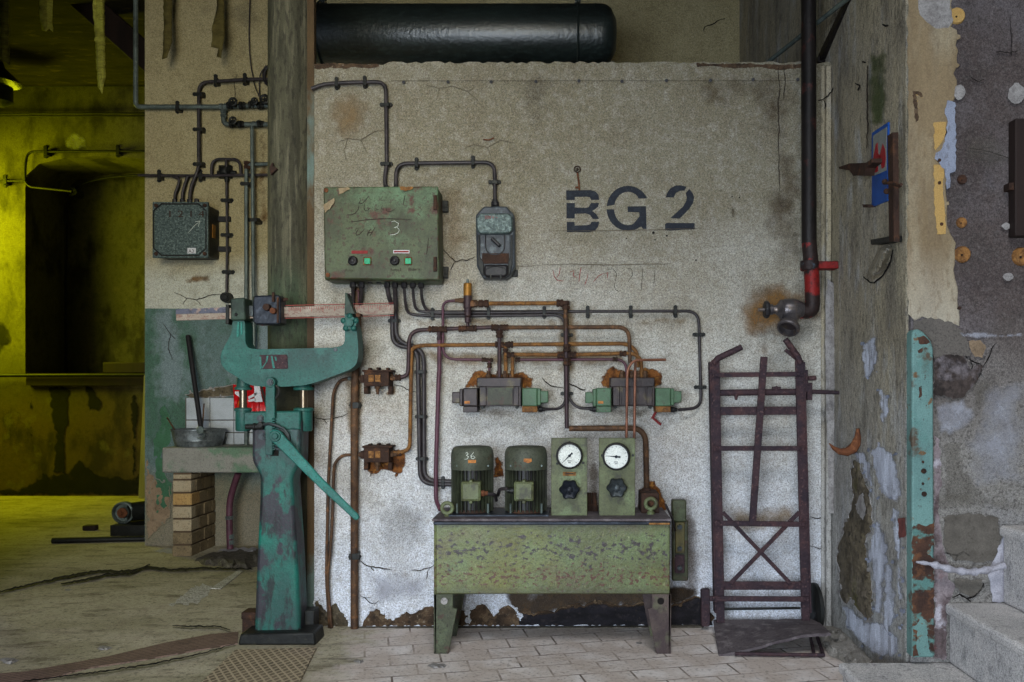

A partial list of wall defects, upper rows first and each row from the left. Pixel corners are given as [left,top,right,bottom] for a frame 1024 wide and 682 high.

peeling [906,0,966,326]
corrosion [747,288,790,334]
spalling [933,339,987,401]
leakage [0,386,139,496]
spalling [836,443,906,660]
spalling [933,432,956,661]
crack [0,564,252,592]
spalling [313,598,350,627]
spalling [362,604,434,626]
spalling [459,599,648,626]
spalling [671,596,714,625]